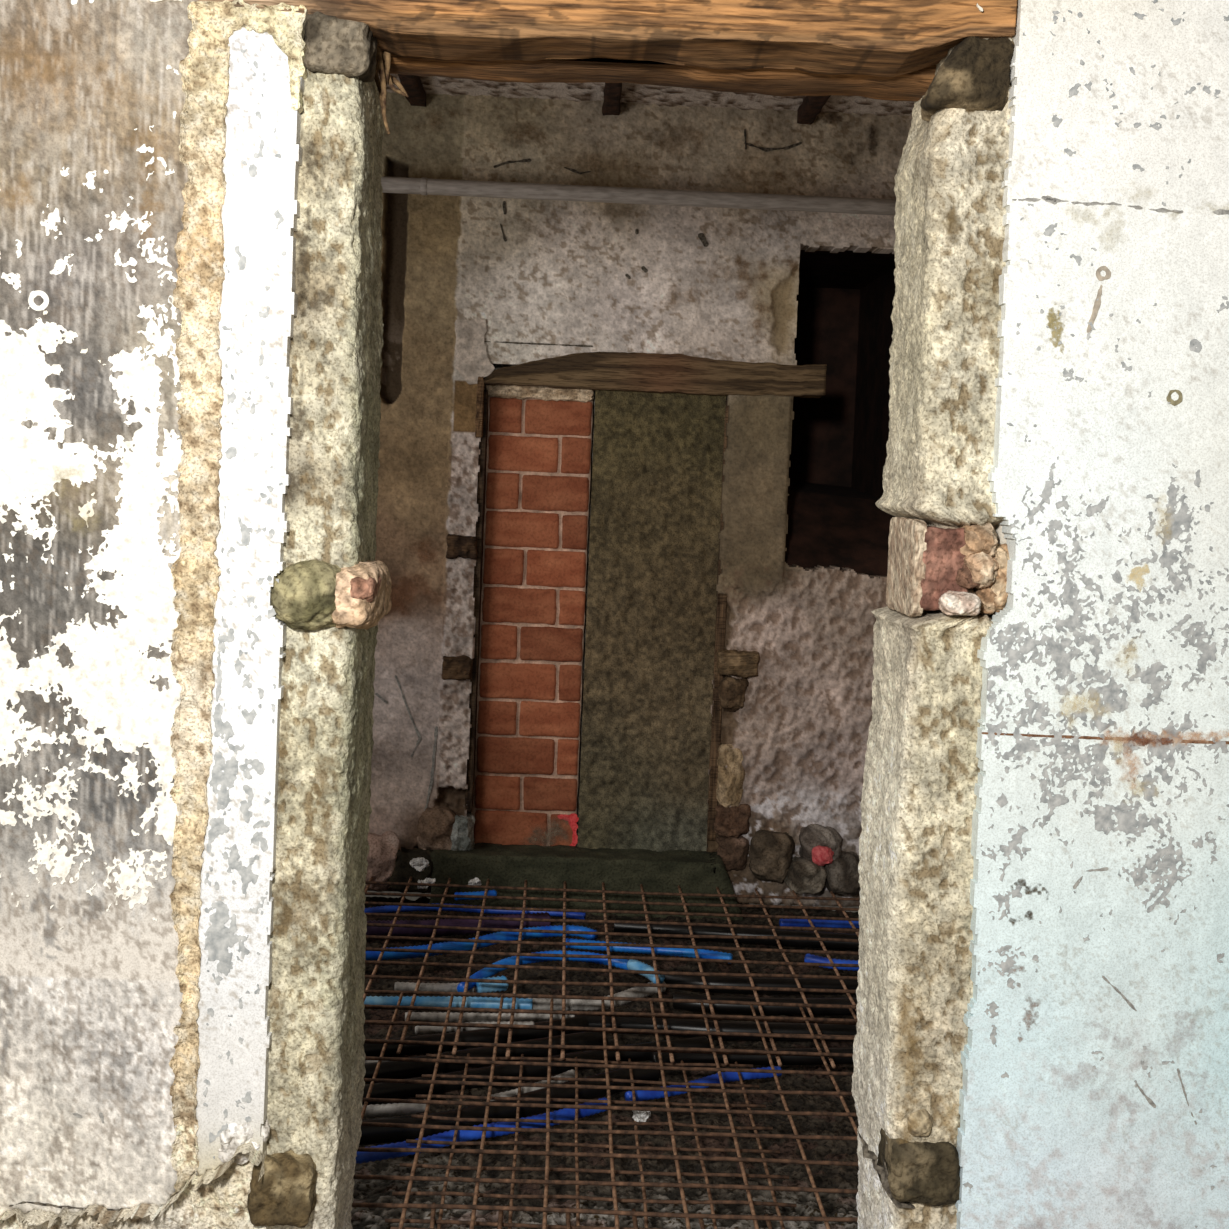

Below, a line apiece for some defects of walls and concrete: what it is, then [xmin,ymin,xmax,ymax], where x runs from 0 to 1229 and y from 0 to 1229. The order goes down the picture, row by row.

peeling [1043,223,1097,266]
peeling [1036,295,1095,345]
peeling [1063,368,1087,382]
peeling [0,0,308,1229]
peeling [886,457,1229,925]
corrosion [1105,731,1229,785]
peeling [978,945,1039,989]
peeling [984,1001,999,1047]
peeling [1134,1046,1174,1087]